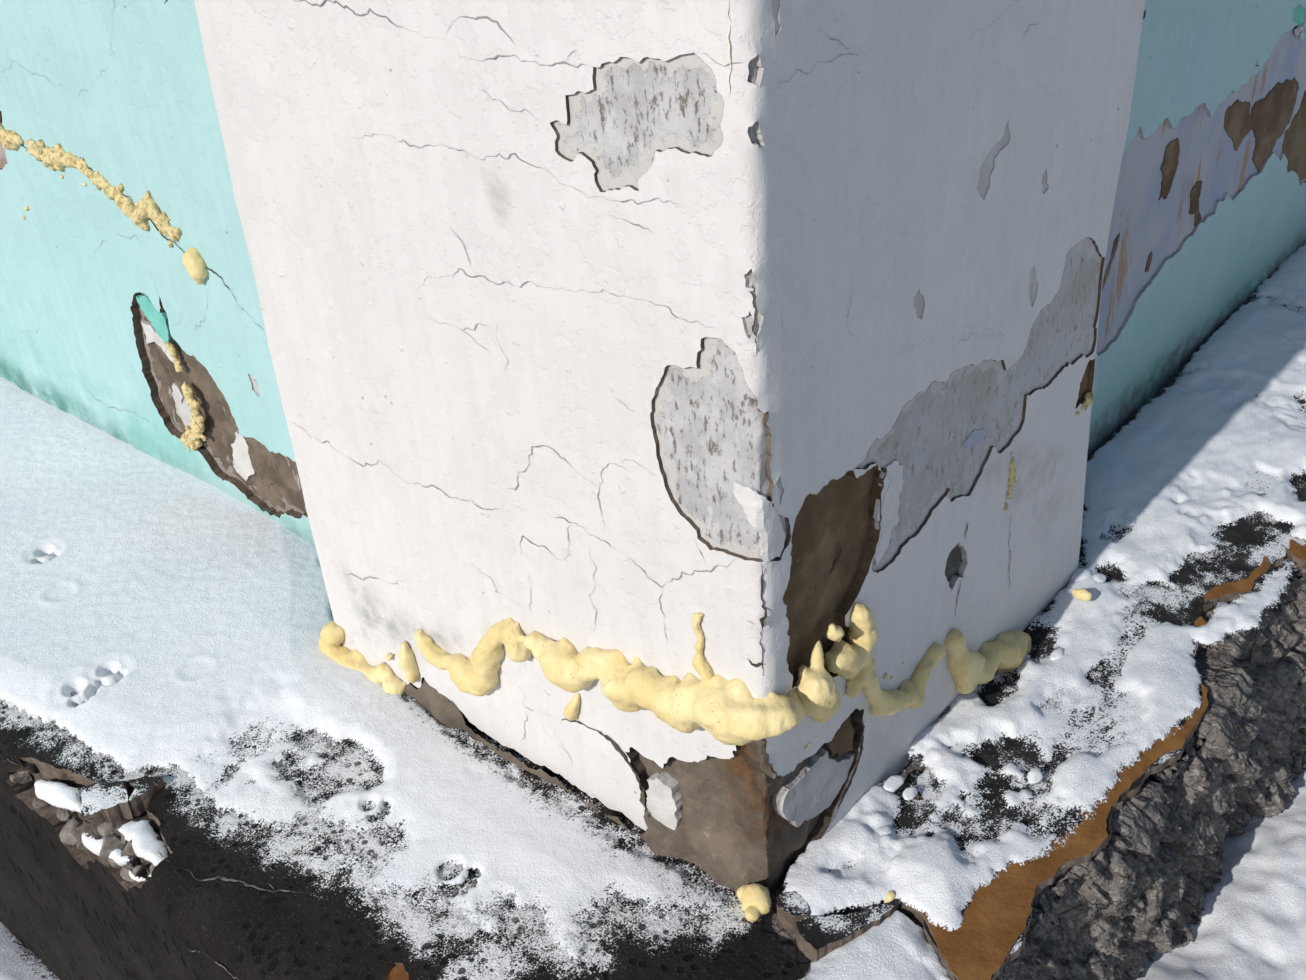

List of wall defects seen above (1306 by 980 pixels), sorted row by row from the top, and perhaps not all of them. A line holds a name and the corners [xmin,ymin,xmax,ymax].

flaking render [0,143,8,170]
crack [294,0,588,121]
crack [365,134,675,230]
peeling [550,52,724,192]
crack [94,195,263,330]
flaking render [130,292,308,519]
peeling [650,0,1306,689]
crack [295,424,767,676]
spalling [4,757,172,891]
spalling [404,677,865,895]